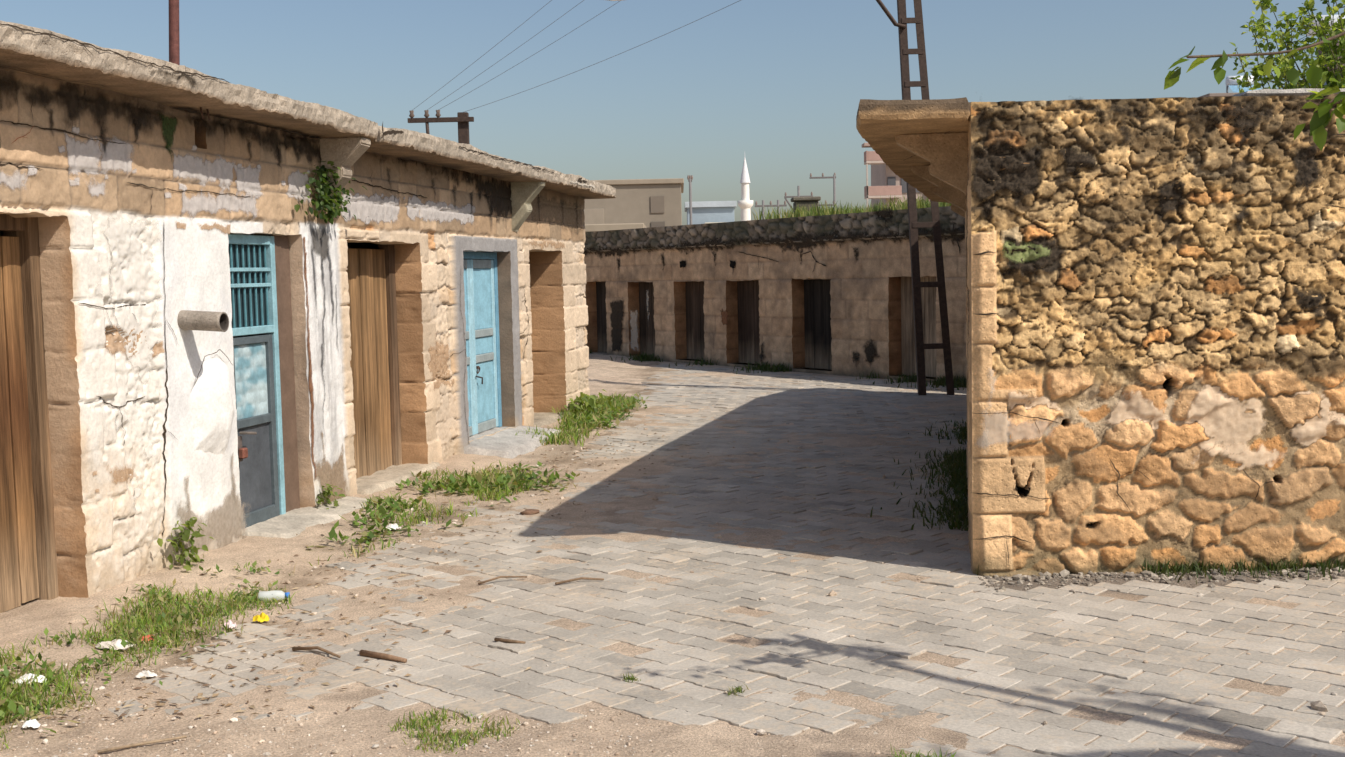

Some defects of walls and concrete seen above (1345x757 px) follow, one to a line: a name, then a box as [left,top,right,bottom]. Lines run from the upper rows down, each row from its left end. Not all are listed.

flaking render [1008,391,1060,422]
flaking render [1106,391,1166,430]
flaking render [1184,385,1284,471]
flaking render [1290,391,1345,446]